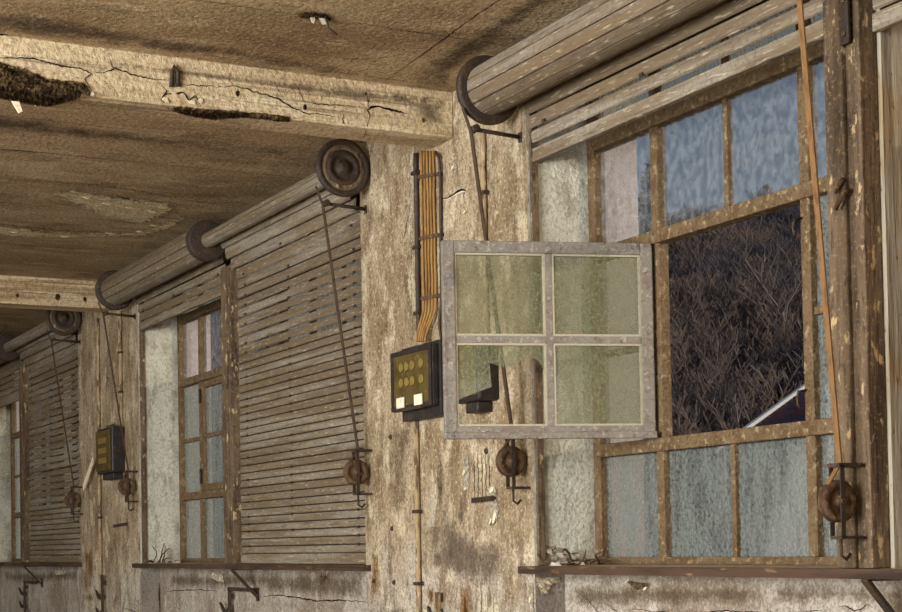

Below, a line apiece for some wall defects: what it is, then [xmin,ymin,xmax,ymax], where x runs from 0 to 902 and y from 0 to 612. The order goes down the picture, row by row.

spalling [0,57,95,114]
spalling [161,85,304,122]
crack [96,0,499,138]
crack [264,594,364,602]
crack [700,604,758,612]